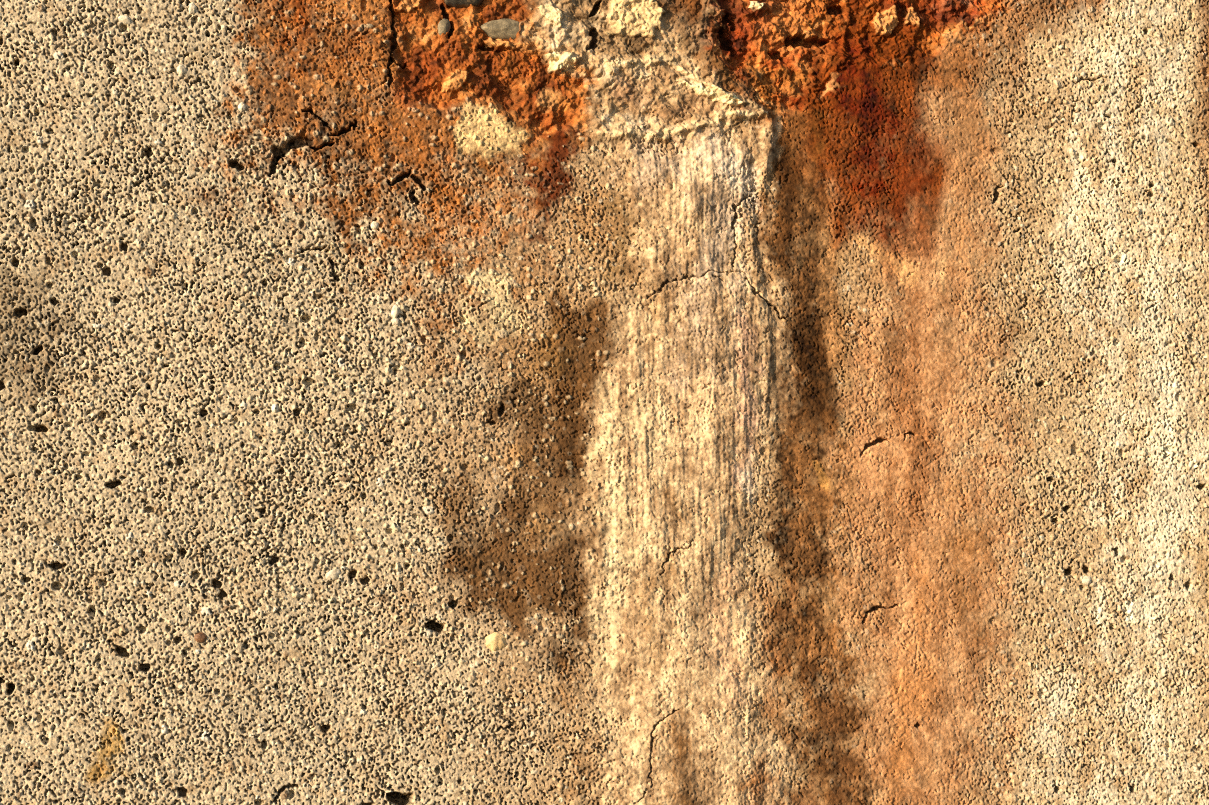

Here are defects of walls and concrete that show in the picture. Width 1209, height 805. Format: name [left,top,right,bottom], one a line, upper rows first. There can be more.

crack [268,109,357,177]
corrosion [186,0,598,395]
peeling [380,0,829,166]
spalling [814,58,847,100]
spalling [826,6,845,16]
spalling [869,0,1025,55]
crack [647,198,785,319]
water stain [425,120,888,805]